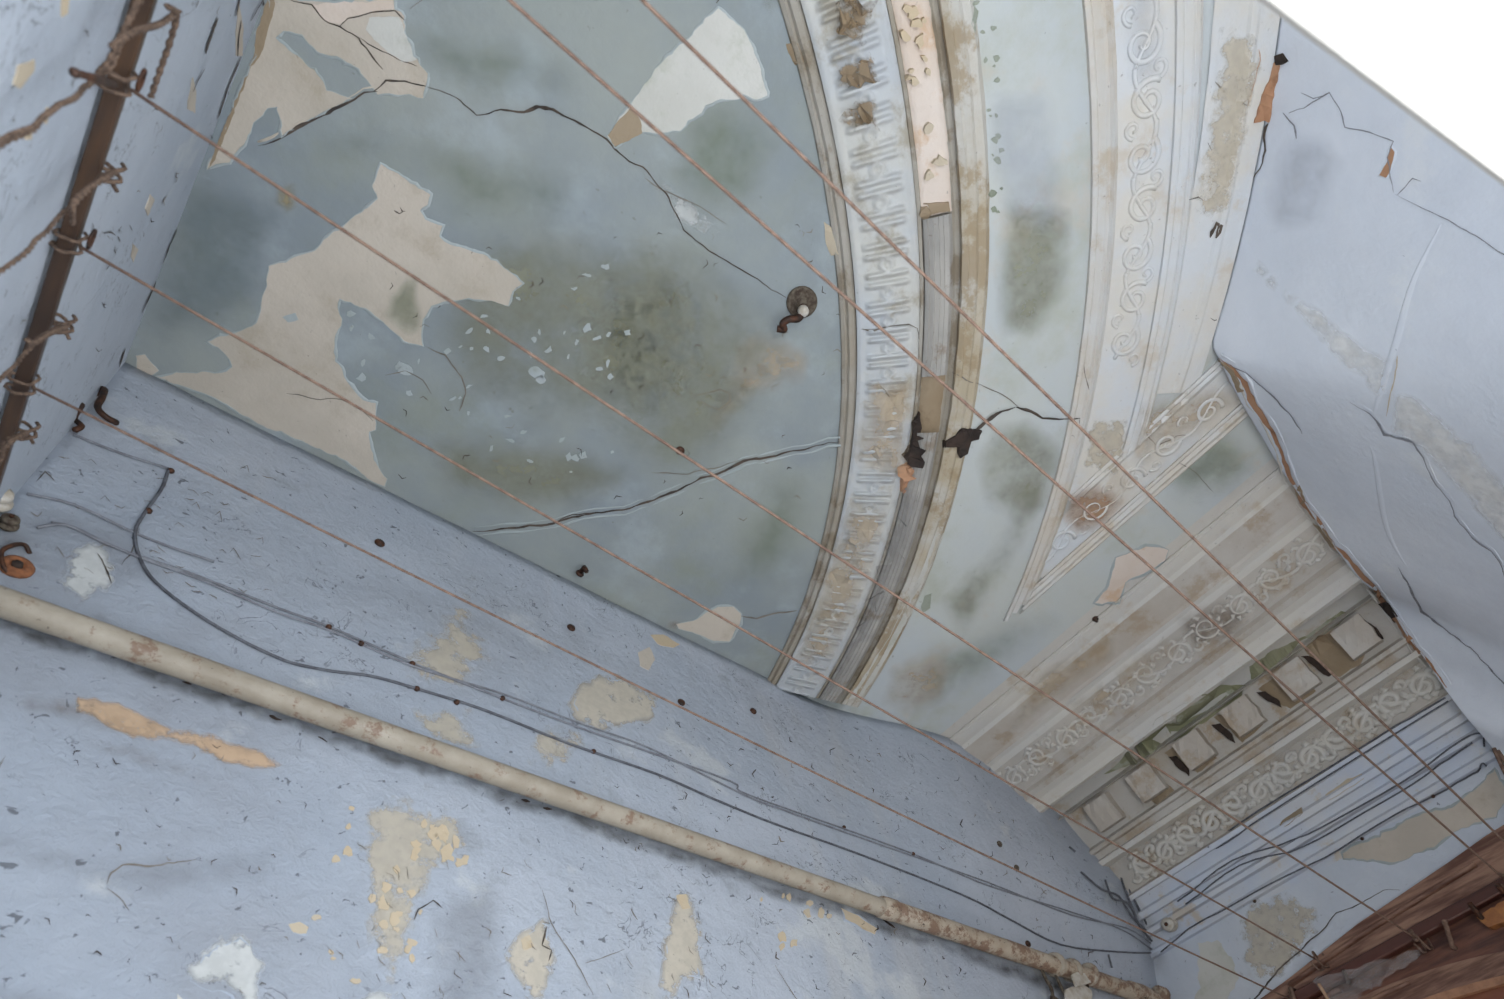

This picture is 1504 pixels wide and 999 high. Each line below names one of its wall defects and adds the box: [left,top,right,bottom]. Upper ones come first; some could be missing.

peeling [206,0,430,170]
peeling [607,6,770,149]
crack [1215,51,1504,255]
crack [1189,197,1223,239]
peeling [136,162,543,487]
damp [474,262,641,373]
crack [472,436,841,536]
crack [1351,402,1504,575]
peeling [638,604,743,671]
crack [1399,569,1504,684]
peeling [1340,767,1504,865]
peeling [177,936,266,999]